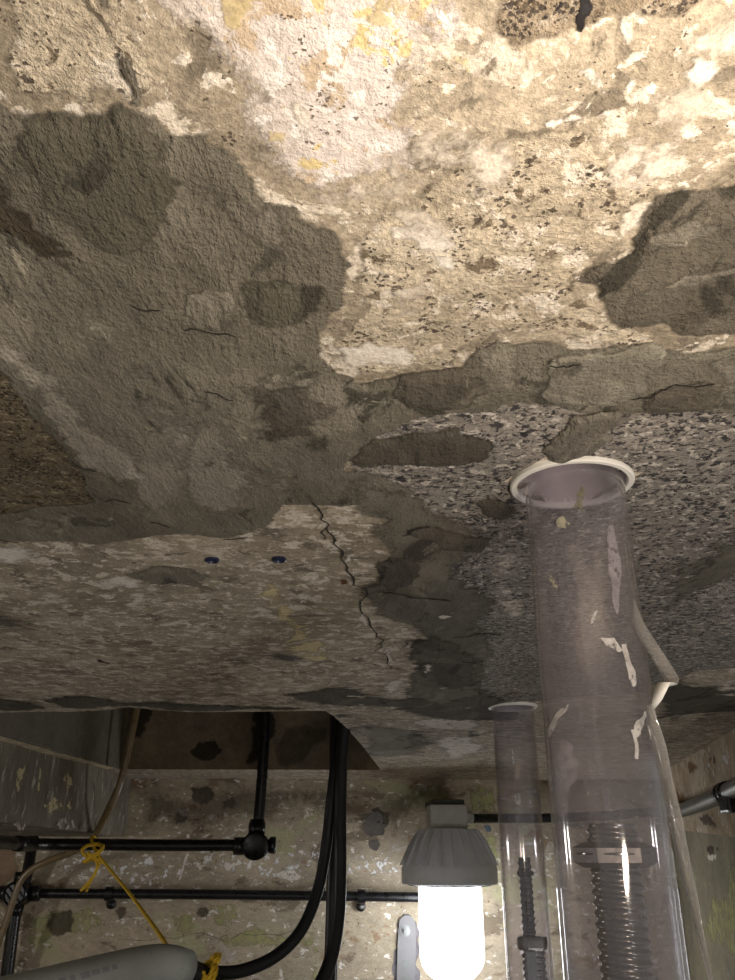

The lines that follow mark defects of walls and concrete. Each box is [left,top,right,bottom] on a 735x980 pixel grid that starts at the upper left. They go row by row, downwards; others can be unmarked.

crack [86,0,137,99]
spalling [0,371,95,514]
crack [313,502,451,669]
spalling [351,401,735,703]